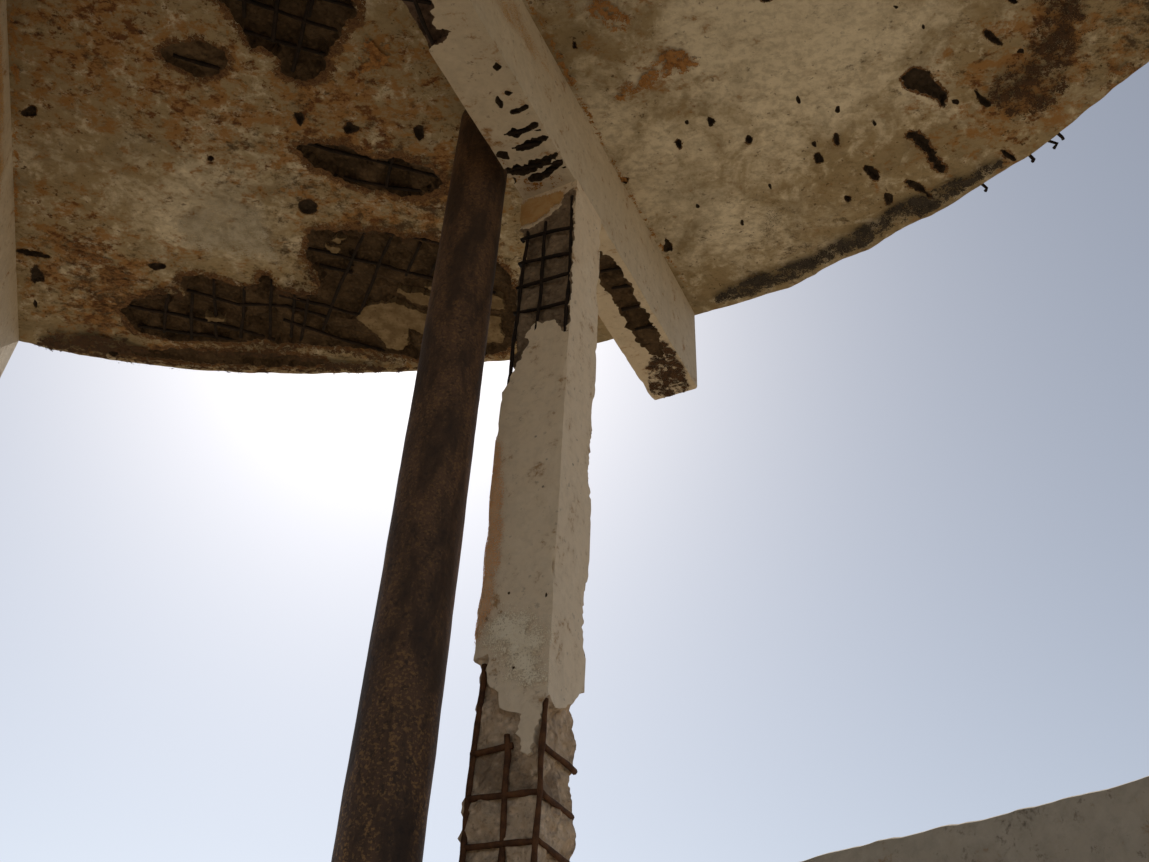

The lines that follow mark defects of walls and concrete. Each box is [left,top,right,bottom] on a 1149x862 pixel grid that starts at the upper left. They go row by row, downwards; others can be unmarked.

spalling [150,0,366,89]
spalling [287,112,450,205]
spalling [495,90,566,184]
spalling [108,198,441,372]
spalling [485,188,576,384]
spalling [599,251,664,358]
spalling [457,654,584,862]